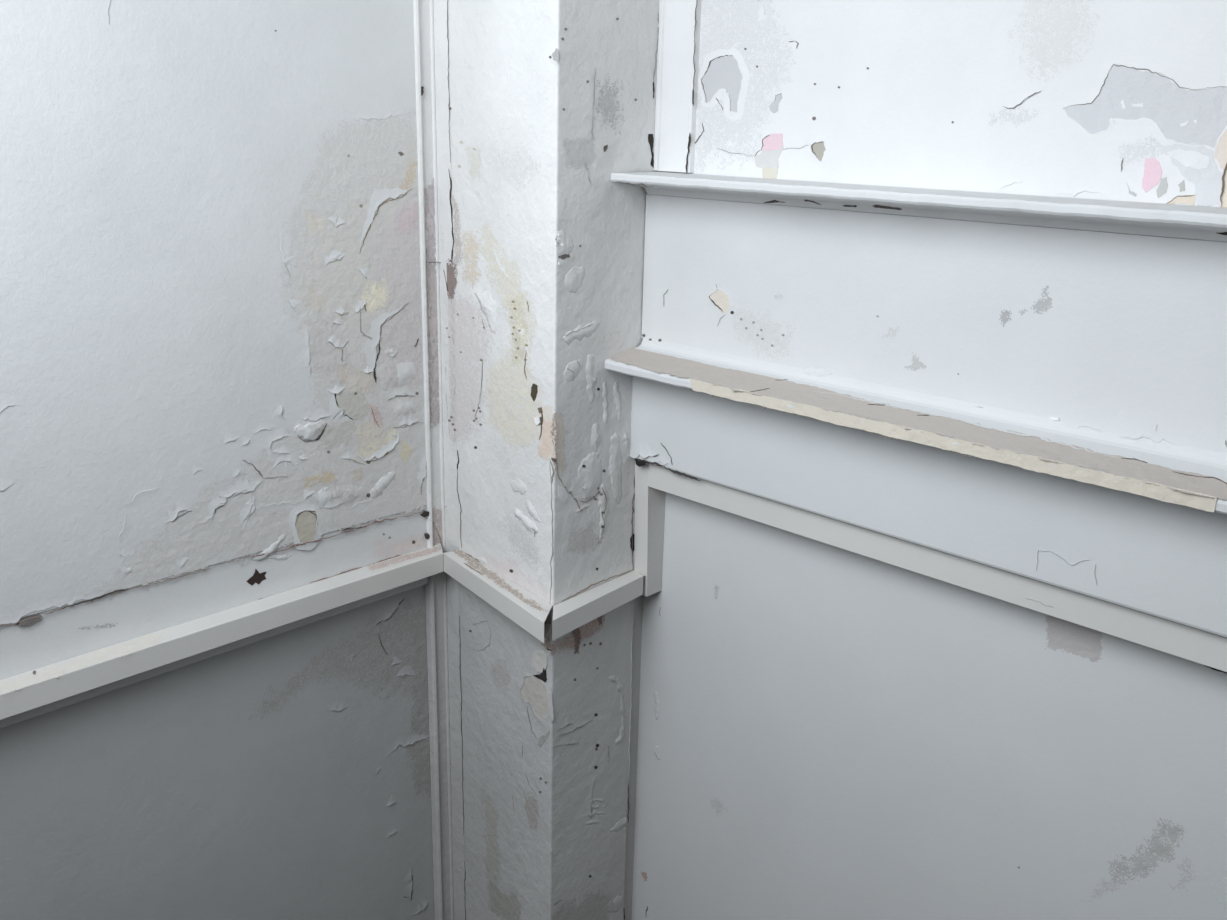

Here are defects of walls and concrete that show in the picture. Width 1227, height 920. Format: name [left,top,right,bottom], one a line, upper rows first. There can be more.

peeling [698,46,758,122]
peeling [754,133,784,179]
peeling [805,135,832,168]
peeling [1052,49,1227,208]
peeling [323,185,413,265]
water stain [81,106,568,611]
peeling [326,299,404,382]
crack [0,189,483,627]
peeling [531,384,543,425]
peeling [610,334,1227,512]
peeling [287,489,347,551]
peeling [0,582,129,626]